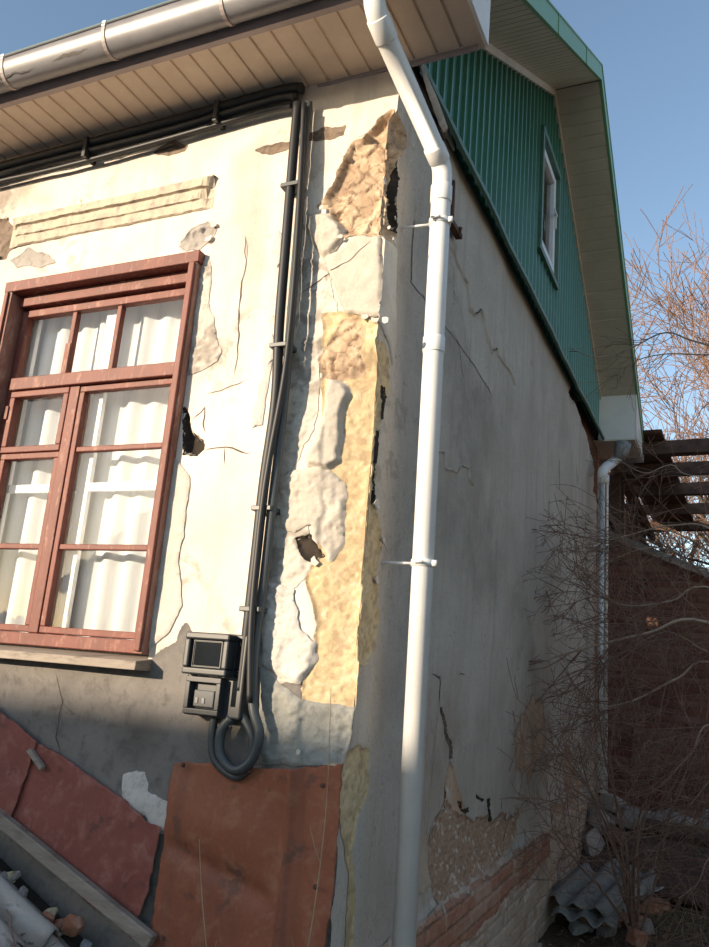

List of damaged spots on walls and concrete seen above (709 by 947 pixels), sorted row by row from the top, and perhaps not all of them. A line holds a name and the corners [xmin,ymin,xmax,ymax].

peeling [316,109,414,245]
peeling [266,230,281,268]
peeling [318,314,369,382]
crack [449,239,516,418]
spalling [149,407,205,648]
spalling [295,533,325,566]
spalling [427,762,521,914]